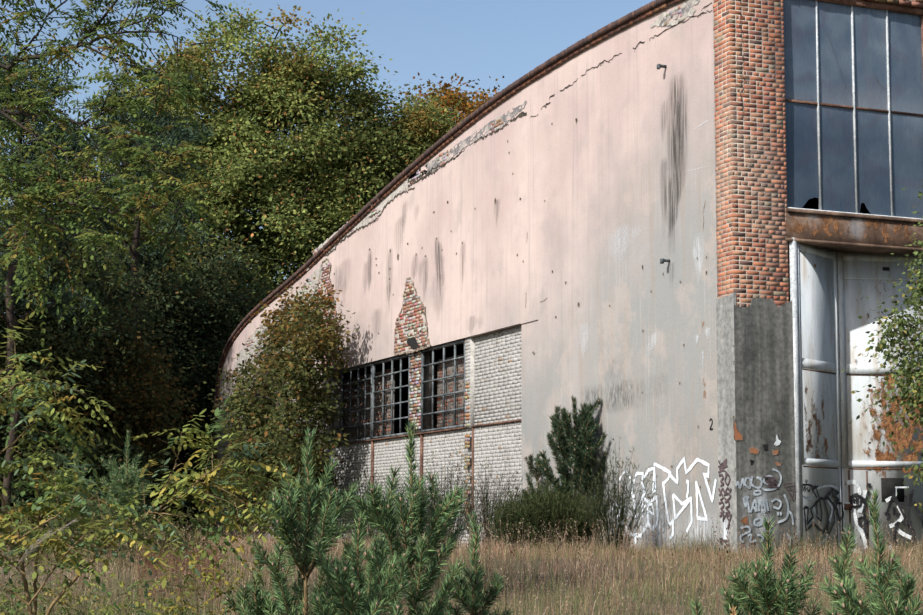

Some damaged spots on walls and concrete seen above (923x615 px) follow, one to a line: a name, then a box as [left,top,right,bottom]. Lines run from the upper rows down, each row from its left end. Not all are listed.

crack [738,2,746,118]
crack [323,2,713,256]
water stain [664,85,684,224]
flaking render [233,100,527,385]
rust [786,215,911,242]
rust [804,386,828,459]
rust [861,373,923,478]